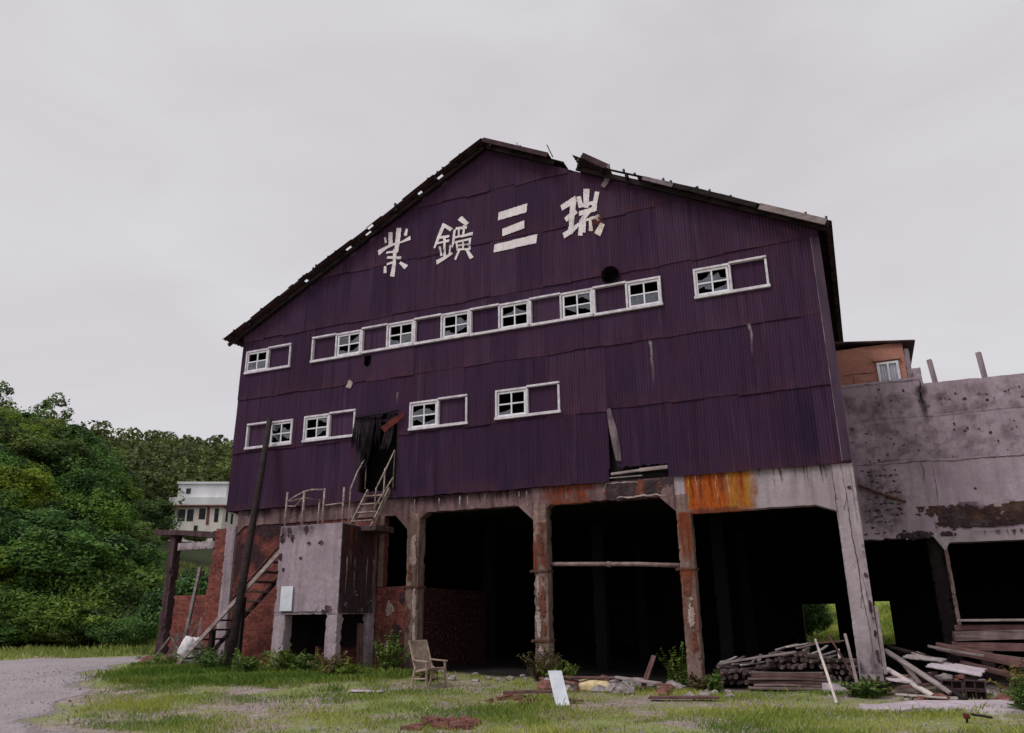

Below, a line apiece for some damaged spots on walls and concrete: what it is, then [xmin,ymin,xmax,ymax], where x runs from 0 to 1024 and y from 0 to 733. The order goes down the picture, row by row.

corrosion [678,471,754,556]
spalling [850,428,1024,541]